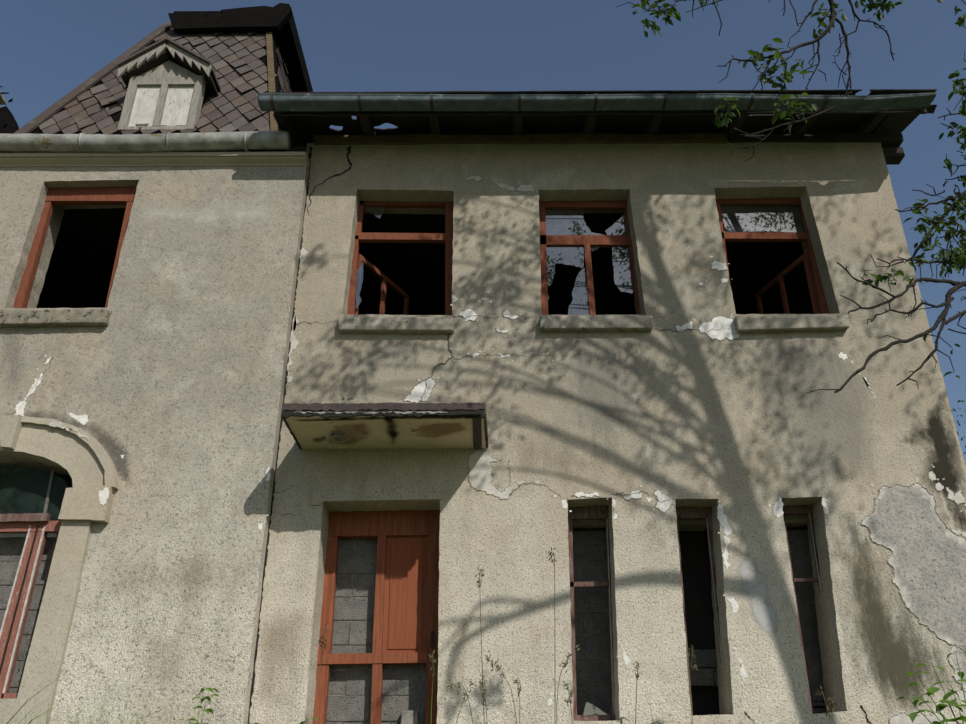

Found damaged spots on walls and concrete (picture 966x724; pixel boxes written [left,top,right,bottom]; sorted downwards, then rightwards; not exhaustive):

spalling [710,256,729,283]
crack [403,308,554,403]
spalling [49,410,90,440]
crack [248,146,352,724]
damp [297,414,482,440]
crack [554,485,675,515]
spalling [717,492,778,636]
flaking render [860,464,966,708]
flaking render [888,711,966,724]